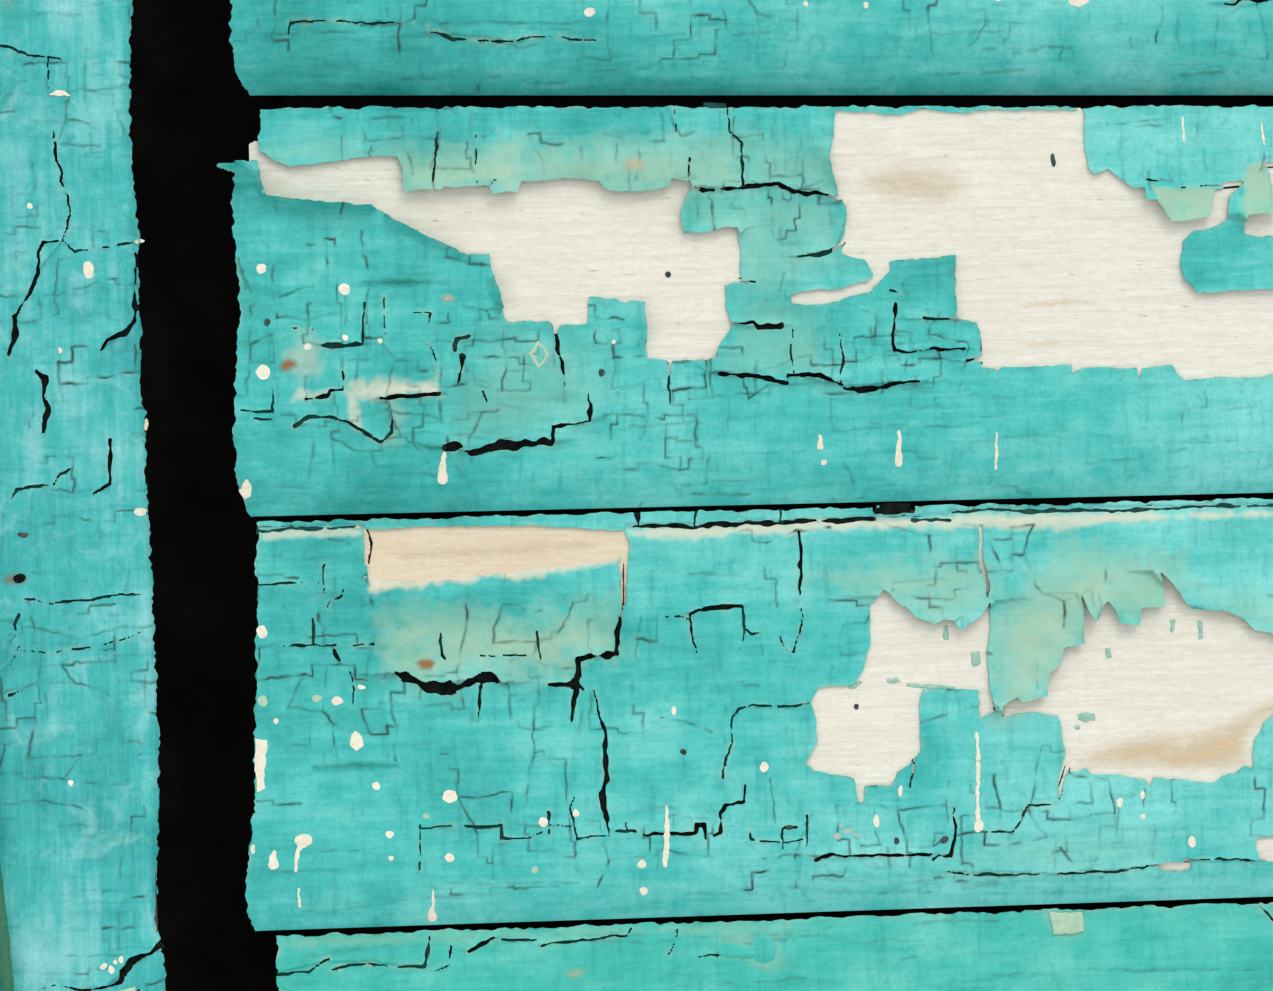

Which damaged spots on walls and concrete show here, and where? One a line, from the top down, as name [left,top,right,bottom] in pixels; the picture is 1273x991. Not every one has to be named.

crack [0,45,61,88]
crack [288,20,394,35]
crack [431,32,596,43]
crack [7,131,139,356]
peeling [217,107,1273,451]
crack [35,370,51,433]
crack [11,468,72,498]
crack [93,439,113,495]
peeling [355,519,633,617]
peeling [380,630,494,688]
peeling [802,524,1273,804]
crack [395,564,1149,877]